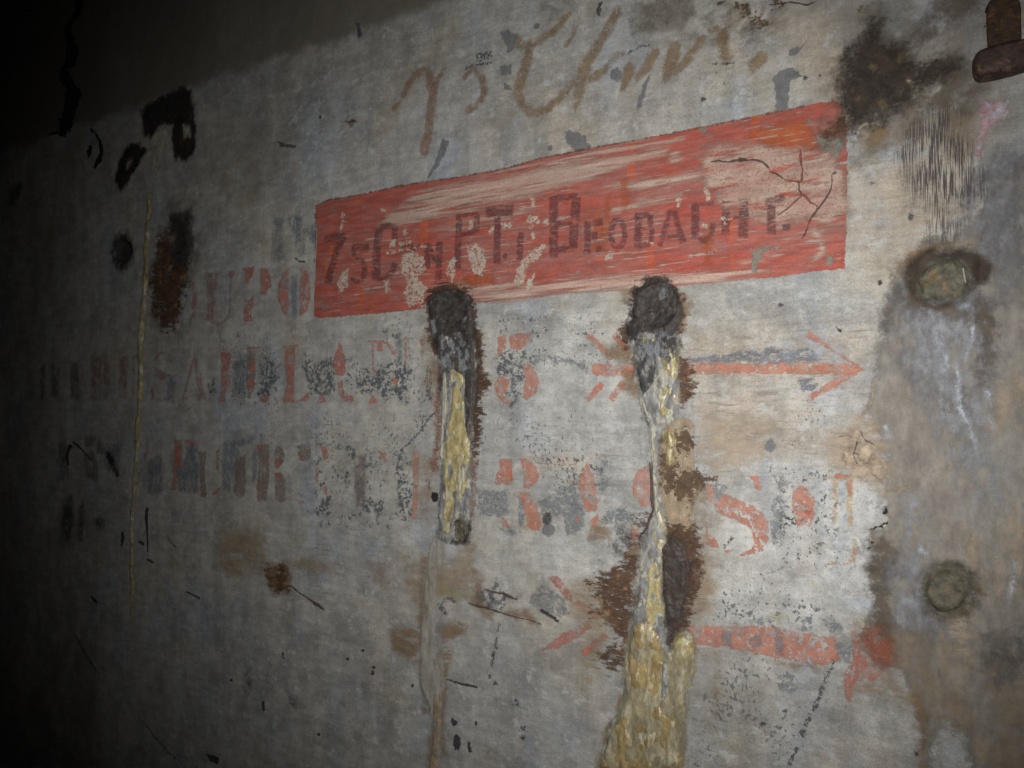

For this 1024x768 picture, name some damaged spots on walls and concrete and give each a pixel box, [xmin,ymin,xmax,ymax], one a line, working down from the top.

crack [47,0,103,169]
crack [711,150,836,239]
corrosion [148,234,190,333]
damp [115,87,196,624]
damp [820,18,1024,768]
corrosion [264,563,324,610]
damp [661,523,710,650]